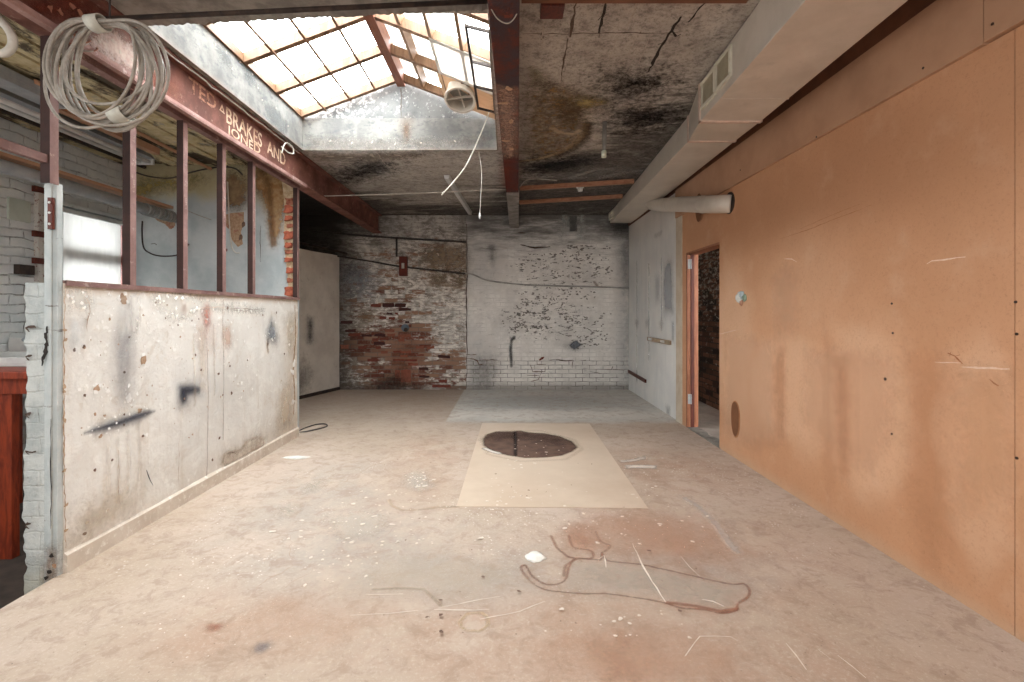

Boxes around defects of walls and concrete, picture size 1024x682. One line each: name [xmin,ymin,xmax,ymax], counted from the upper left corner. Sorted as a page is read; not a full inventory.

crack [525,3,705,80]
leakage [519,64,686,176]
spalling [340,303,451,388]
peeling [502,245,613,349]